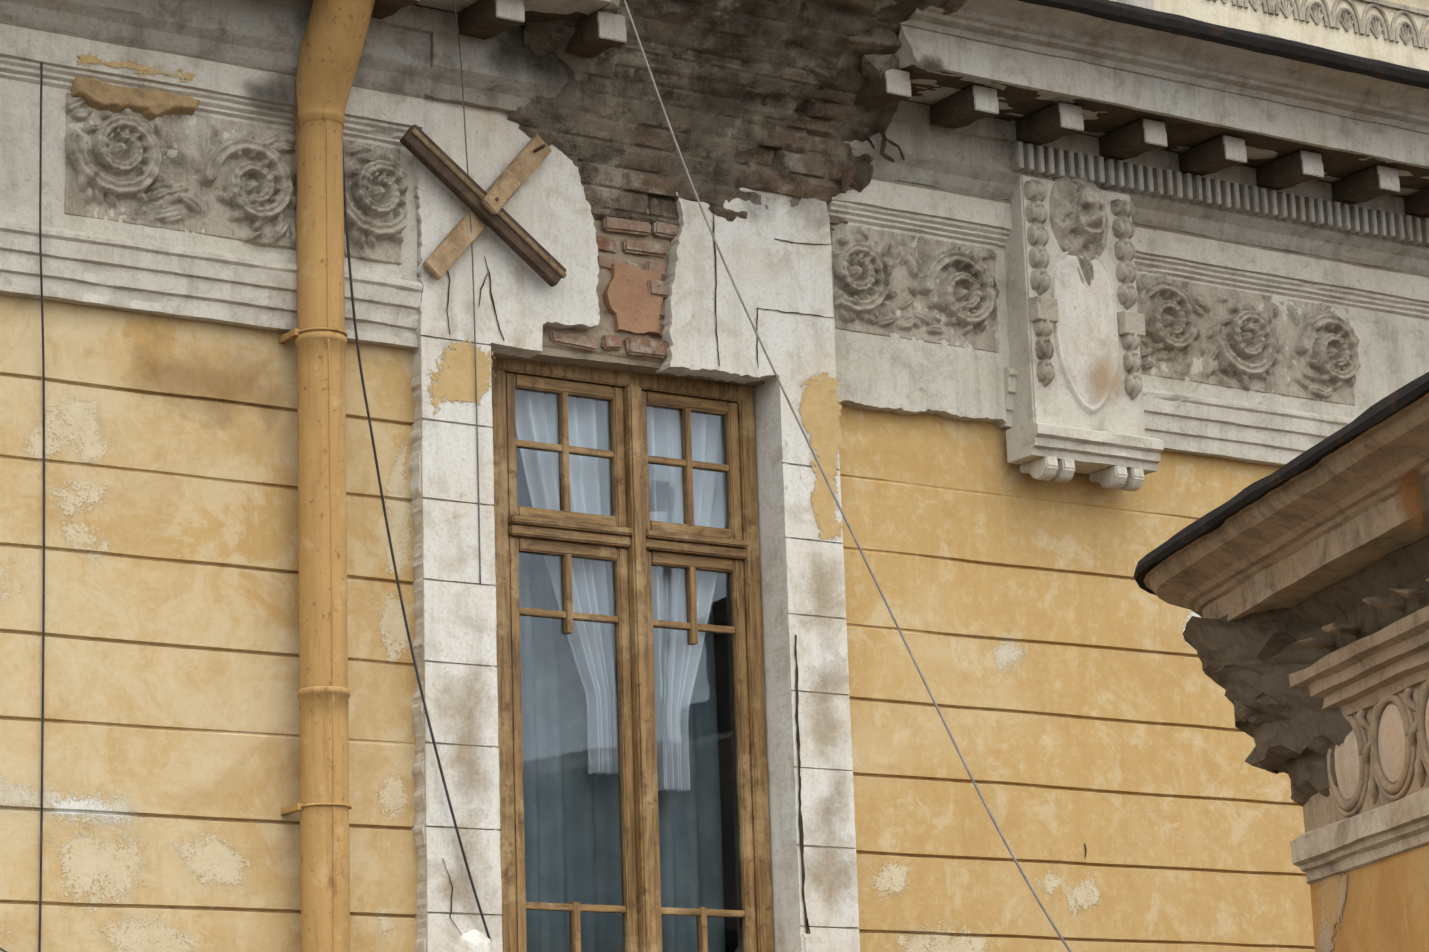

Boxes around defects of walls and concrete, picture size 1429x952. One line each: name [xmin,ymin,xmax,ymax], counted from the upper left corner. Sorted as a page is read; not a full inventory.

spalling [507,0,967,363]
spalling [1362,578,1429,612]
spalling [1183,608,1361,807]
peeling [43,823,204,952]
peeling [170,827,252,894]
peeling [868,861,912,901]
peeling [1034,870,1101,917]
peeling [890,915,991,952]